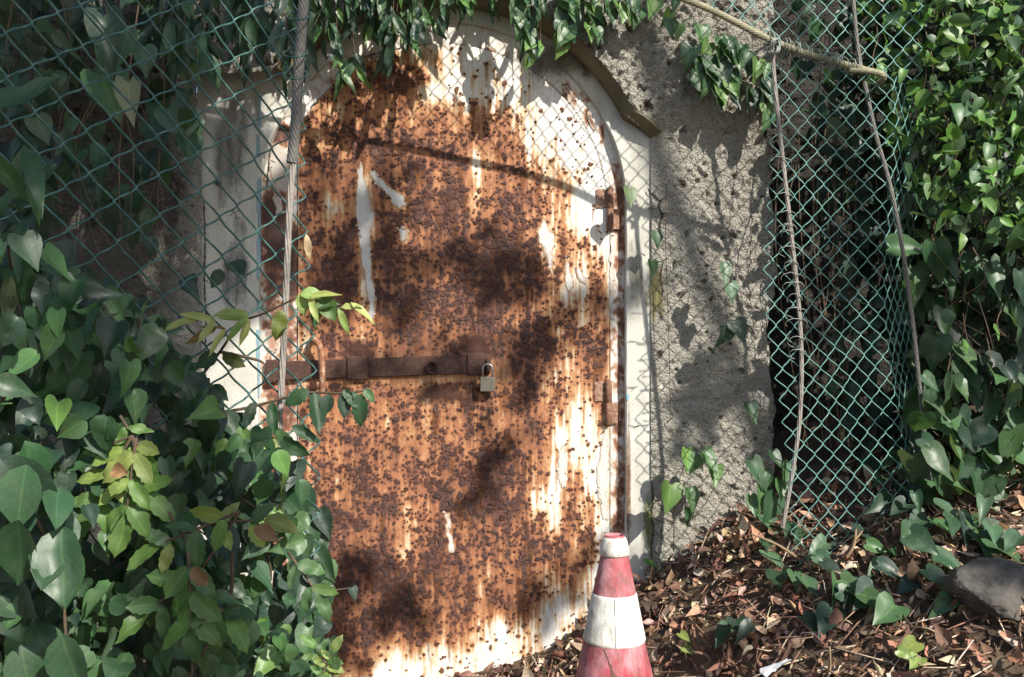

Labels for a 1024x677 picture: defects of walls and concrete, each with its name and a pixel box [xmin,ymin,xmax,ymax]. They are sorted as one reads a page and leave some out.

corrosion [297,47,610,677]